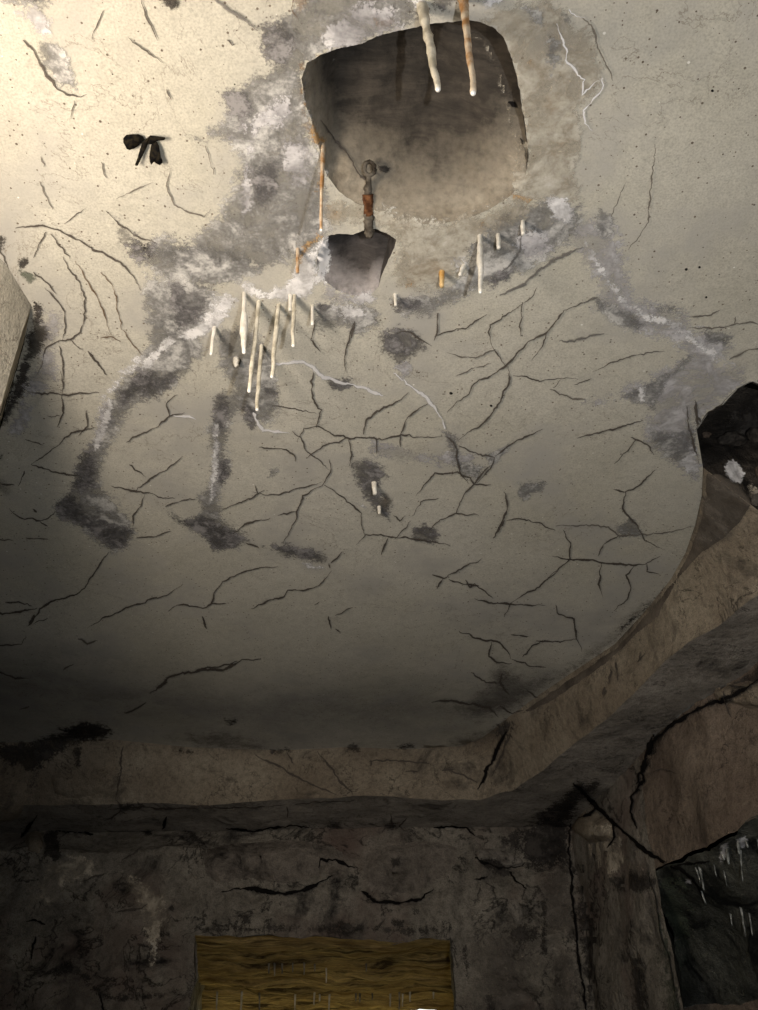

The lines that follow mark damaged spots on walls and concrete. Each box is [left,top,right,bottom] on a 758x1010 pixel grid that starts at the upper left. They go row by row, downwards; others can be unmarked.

crack [129,1,163,63]
crack [215,0,258,46]
crack [23,40,87,115]
spalling [301,20,529,225]
spalling [316,229,396,296]
damp [52,0,744,555]
crack [0,157,211,541]
spalling [695,382,758,435]
crack [79,236,691,717]
damp [698,459,758,545]
damp [263,542,325,569]
crack [221,858,434,905]